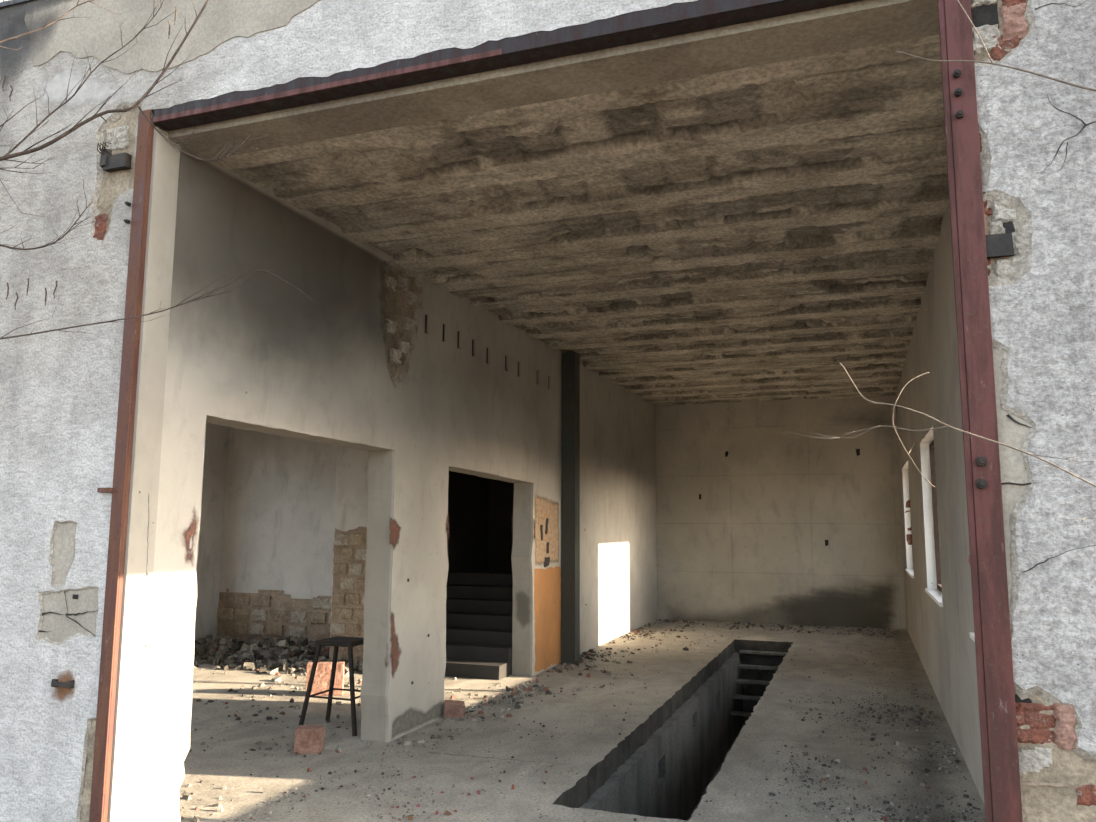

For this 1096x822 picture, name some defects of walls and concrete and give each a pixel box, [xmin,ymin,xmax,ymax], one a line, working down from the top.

peeling [24,0,320,74]
flaking render [970,0,1036,66]
flaking render [91,100,144,244]
flaking render [978,124,1032,286]
crack [1041,93,1096,172]
peeling [992,339,1036,640]
peeling [36,520,99,645]
flaking render [183,515,198,561]
peeling [534,496,559,567]
crack [1022,545,1095,573]
rust [55,672,73,699]
flaking render [1014,682,1096,822]